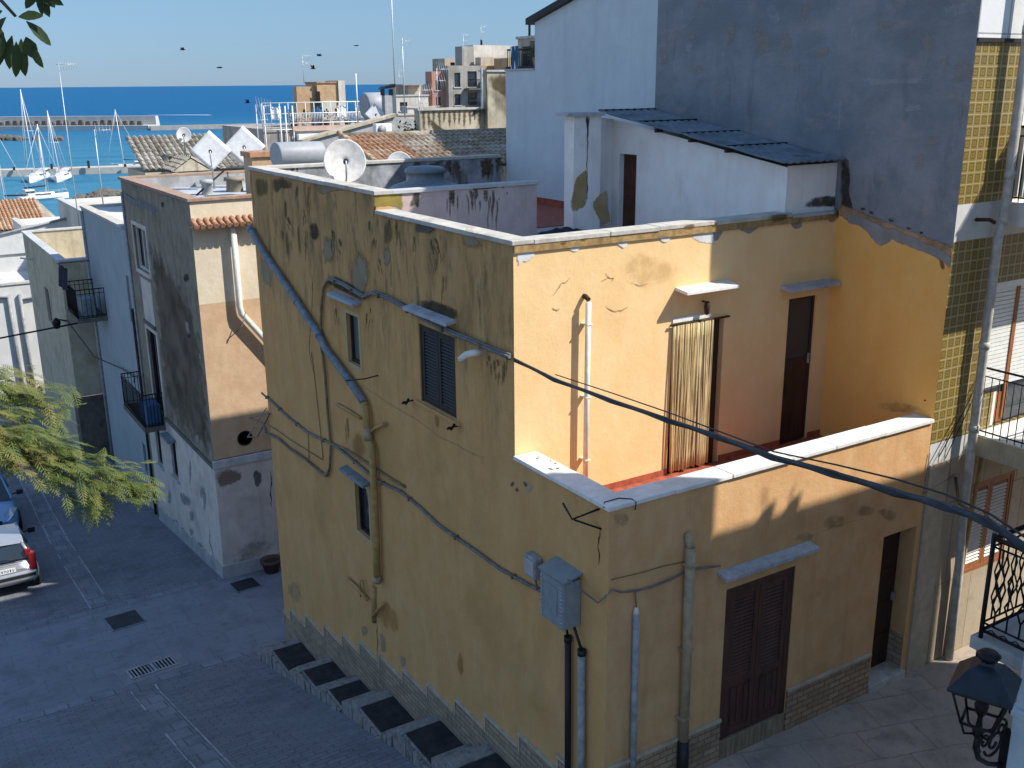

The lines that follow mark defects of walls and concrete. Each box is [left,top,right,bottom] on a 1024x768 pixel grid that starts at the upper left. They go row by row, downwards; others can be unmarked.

crack [584,116,592,194]
leakage [414,158,508,226]
flaking render [571,171,611,224]
leakage [807,160,852,217]
flaking render [839,205,951,256]
flaking render [217,471,241,487]